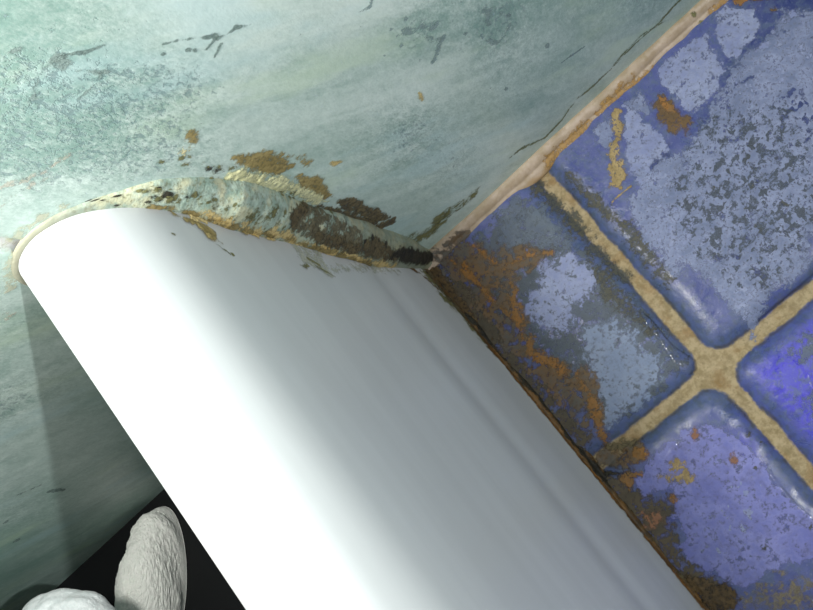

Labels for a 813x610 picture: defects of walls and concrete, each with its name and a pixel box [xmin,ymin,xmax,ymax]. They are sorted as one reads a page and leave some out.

crack [510,0,681,158]
rust [543,66,653,202]
rust [652,94,694,136]
rust [691,0,761,23]
peeling [197,222,217,241]
rust [431,230,719,586]